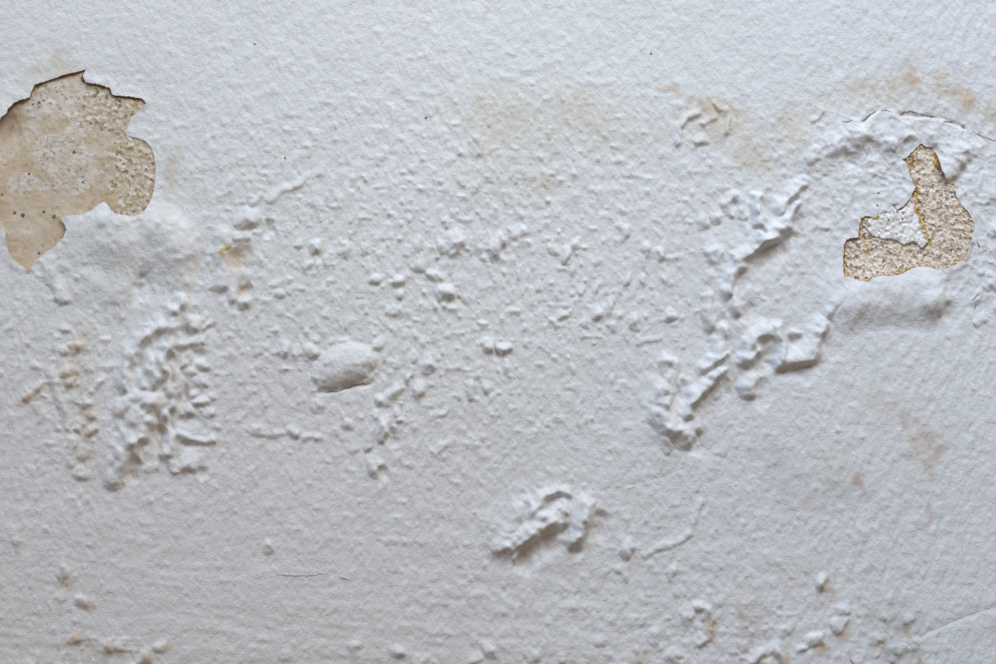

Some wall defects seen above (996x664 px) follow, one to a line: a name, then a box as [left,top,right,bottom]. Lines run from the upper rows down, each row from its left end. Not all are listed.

peeling [0,69,156,272]
peeling [843,144,975,282]